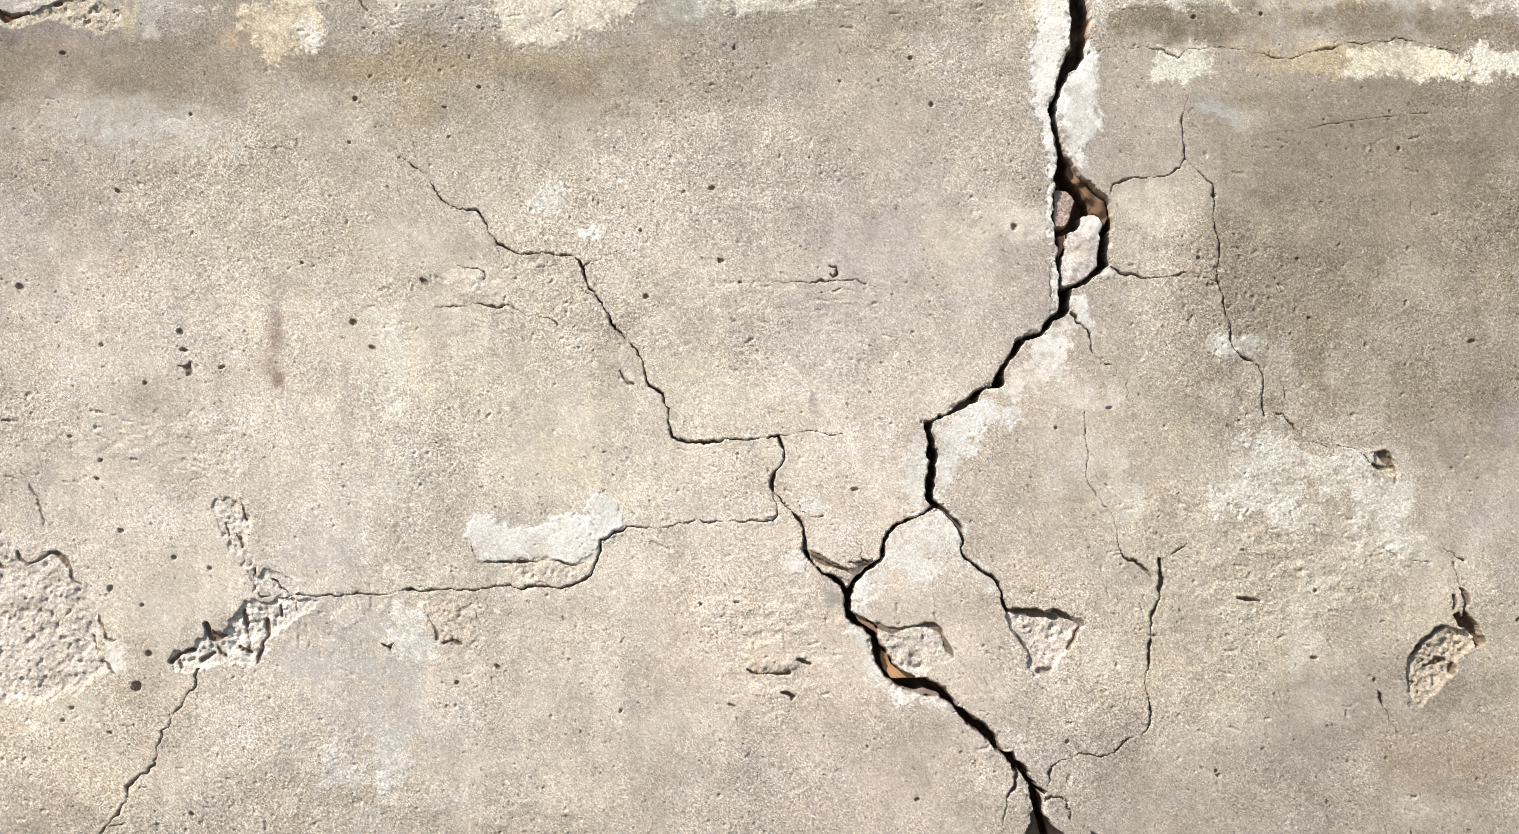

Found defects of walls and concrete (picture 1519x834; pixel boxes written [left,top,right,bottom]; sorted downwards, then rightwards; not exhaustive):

spalling [0,0,124,37]
spalling [20,469,46,527]
crack [254,0,1469,834]
spalling [0,529,142,723]
spalling [146,497,321,674]
spalling [1406,625,1475,709]
crack [101,668,201,834]
spalling [1032,804,1053,834]